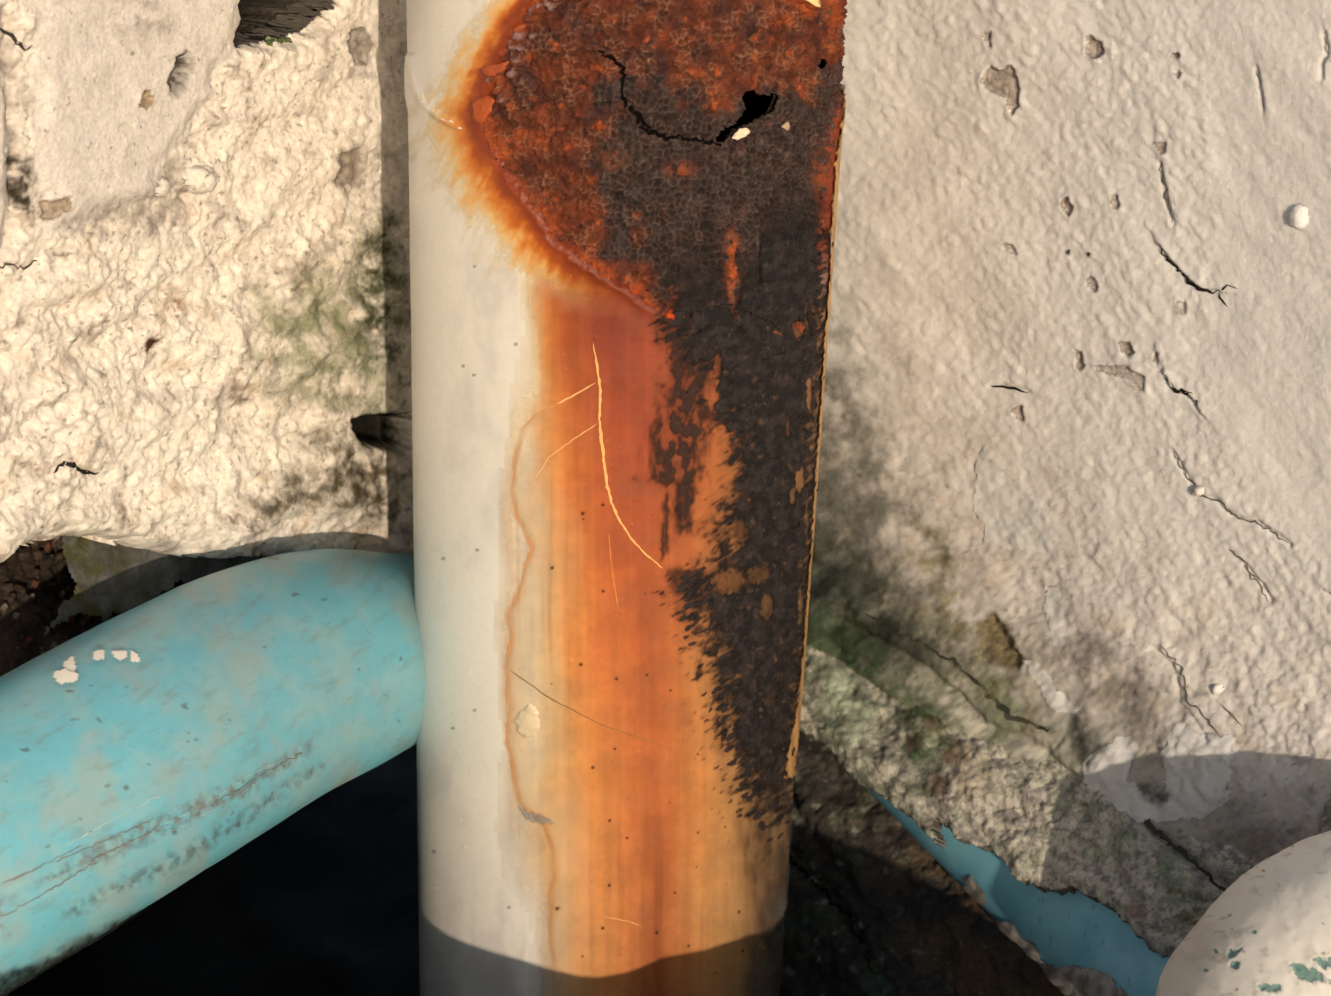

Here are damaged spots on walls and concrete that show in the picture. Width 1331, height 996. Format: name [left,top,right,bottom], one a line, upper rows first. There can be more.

spalling [235,0,300,46]
spalling [980,65,1019,115]
crack [1158,162,1237,306]
spalling [1076,342,1144,391]
crack [54,461,99,475]
rust [426,0,848,996]
leakage [806,403,936,669]
crack [1173,451,1288,601]
crack [911,638,1050,733]
spalling [976,614,1077,714]
leakage [1073,716,1103,761]
peeling [1082,722,1235,823]